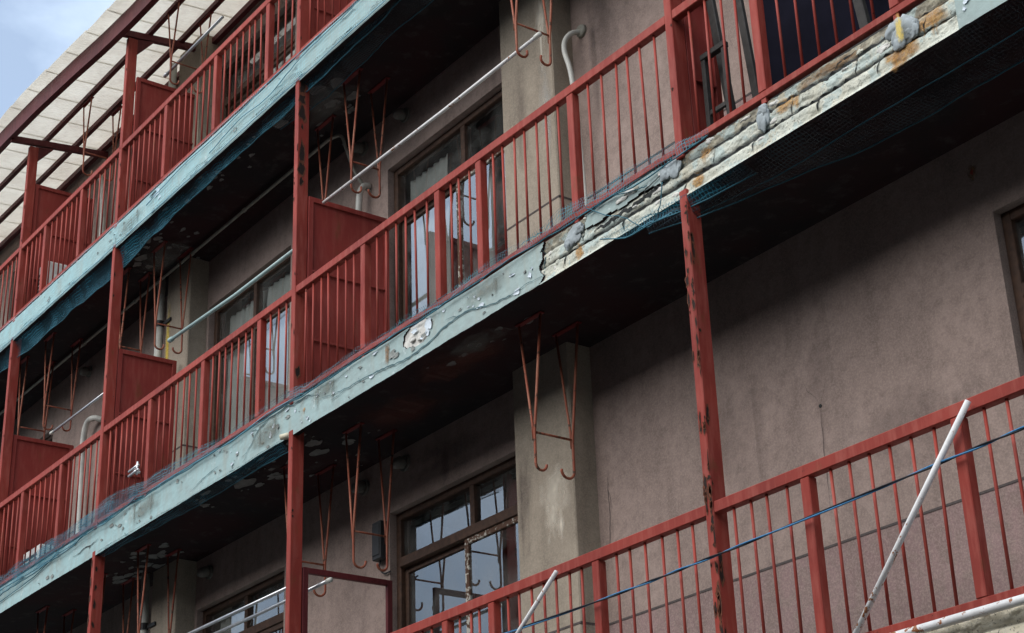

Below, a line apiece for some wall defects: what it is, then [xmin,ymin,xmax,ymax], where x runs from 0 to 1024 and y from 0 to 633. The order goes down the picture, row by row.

spalling [372,317,433,359]
crack [243,1,955,460]
spalling [502,0,968,376]
corrosion [886,8,943,69]